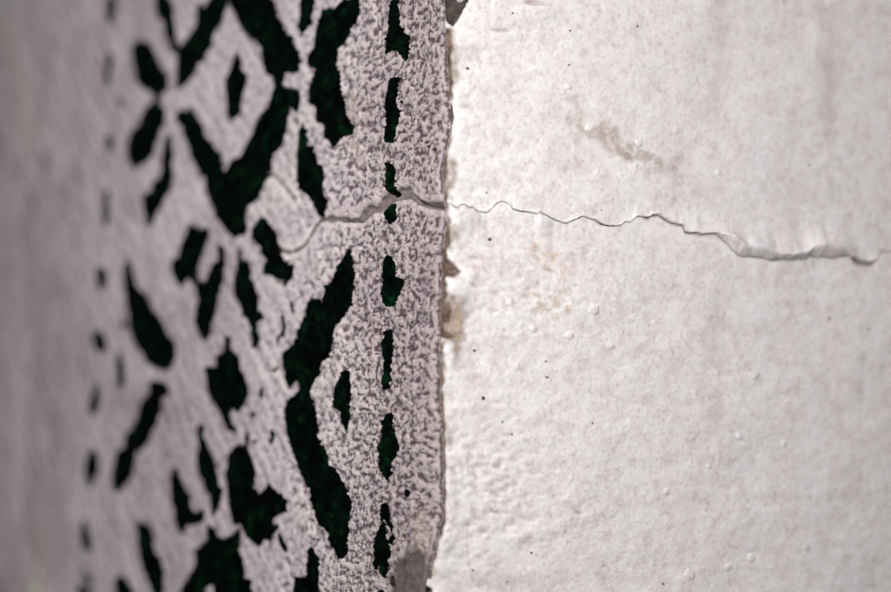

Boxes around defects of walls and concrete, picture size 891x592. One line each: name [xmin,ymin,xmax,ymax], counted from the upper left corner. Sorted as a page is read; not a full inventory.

spalling [445,0,469,26]
crack [280,187,891,264]
spalling [442,251,460,277]
spalling [440,302,460,338]